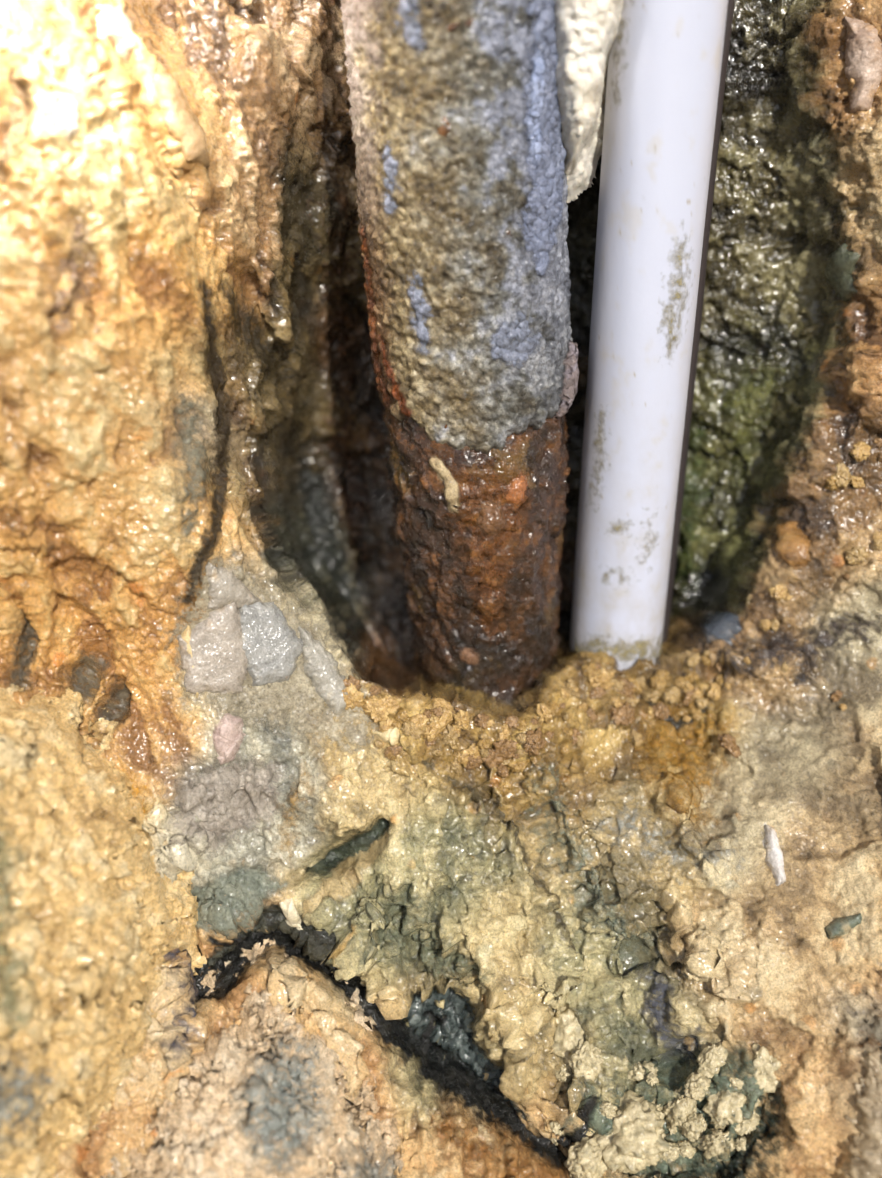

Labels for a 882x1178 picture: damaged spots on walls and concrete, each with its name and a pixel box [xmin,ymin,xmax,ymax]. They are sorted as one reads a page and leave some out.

corrosion [429,456,531,637]
corrosion [459,647,478,665]
crack [194,929,600,1172]